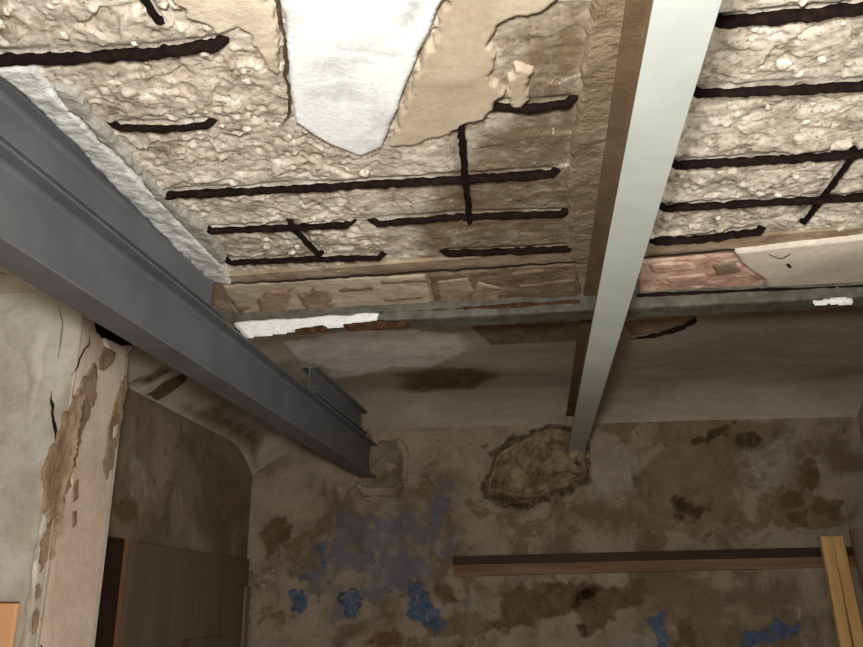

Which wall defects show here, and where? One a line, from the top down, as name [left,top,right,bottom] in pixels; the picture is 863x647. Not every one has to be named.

spalling [649,0,863,246]
spalling [0,0,592,378]
flaking render [637,252,765,292]
crack [49,394,57,441]
crack [58,308,90,374]
leakage [404,369,489,390]
peeling [20,322,134,647]
spalling [481,424,591,509]
leakage [587,419,792,537]